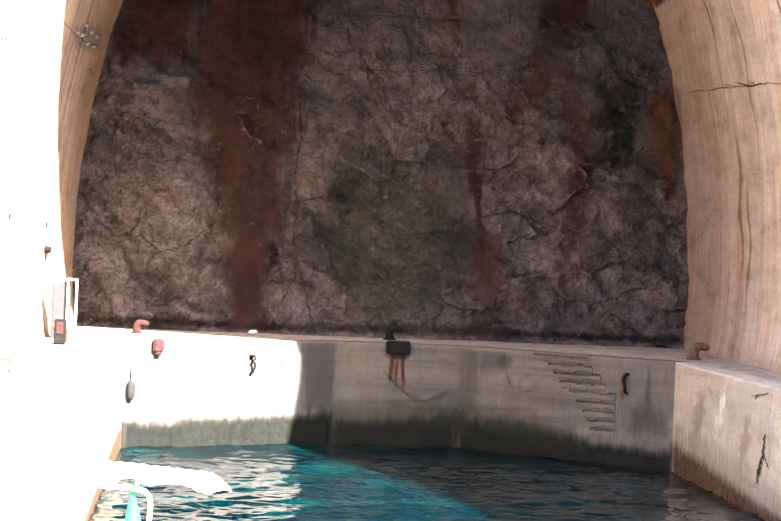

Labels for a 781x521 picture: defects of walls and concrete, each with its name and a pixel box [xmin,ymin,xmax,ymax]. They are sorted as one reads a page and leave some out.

crack [42,0,101,47]
spalling [75,22,102,52]
crack [693,82,781,92]
crack [282,103,343,333]
crack [470,197,548,224]
crack [128,220,217,276]
corrosion [389,356,405,384]
water stain [333,413,780,521]